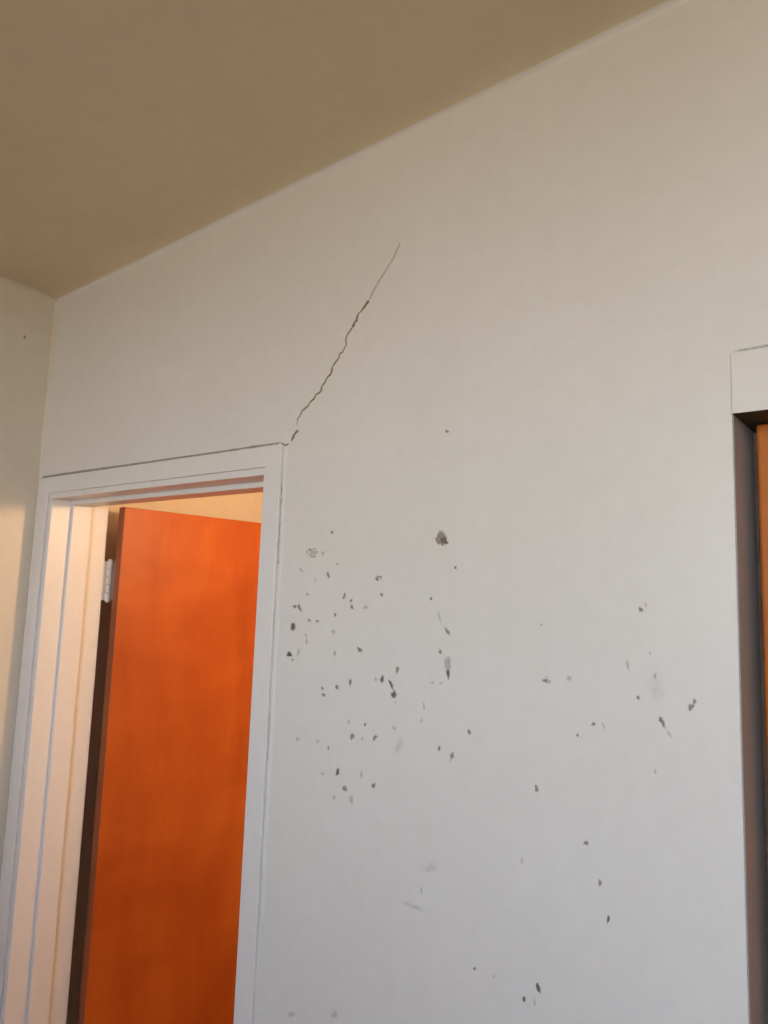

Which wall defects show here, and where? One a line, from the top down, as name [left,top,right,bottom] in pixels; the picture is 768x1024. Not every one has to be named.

crack [43,299,371,478]